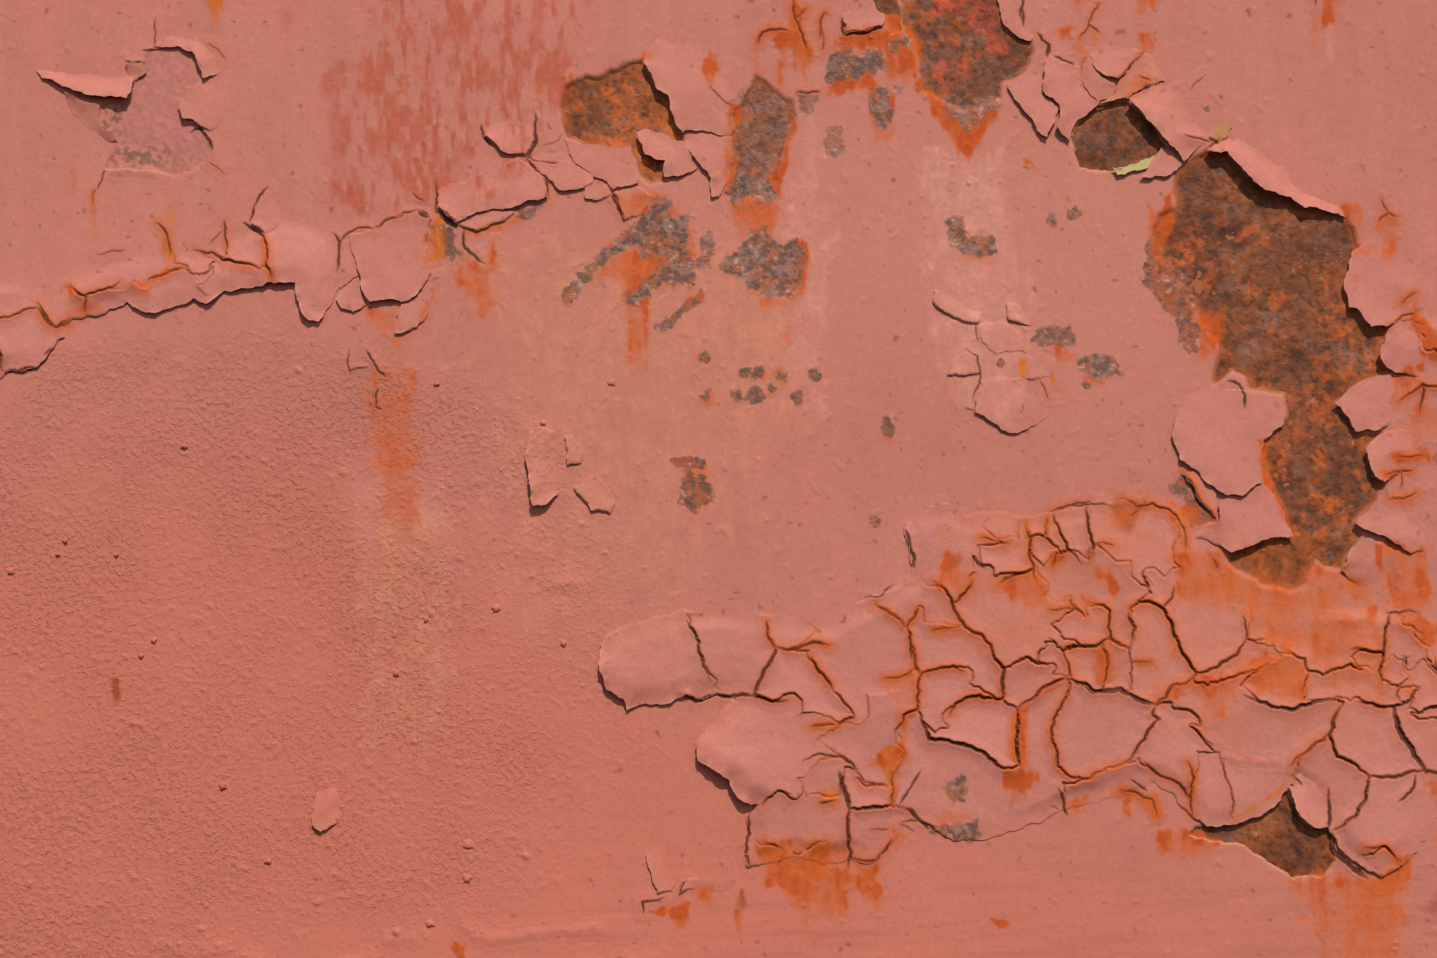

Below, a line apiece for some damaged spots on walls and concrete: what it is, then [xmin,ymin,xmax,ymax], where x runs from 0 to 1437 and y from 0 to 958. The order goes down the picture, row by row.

peeling [36,7,236,199]
peeling [314,0,801,229]
rust [700,50,734,114]
crack [0,71,667,391]
rust [561,193,813,376]
rust [698,348,822,411]
peeling [933,289,1125,433]
peeling [1072,84,1428,583]
rust [669,454,718,522]
crack [598,189,1437,939]